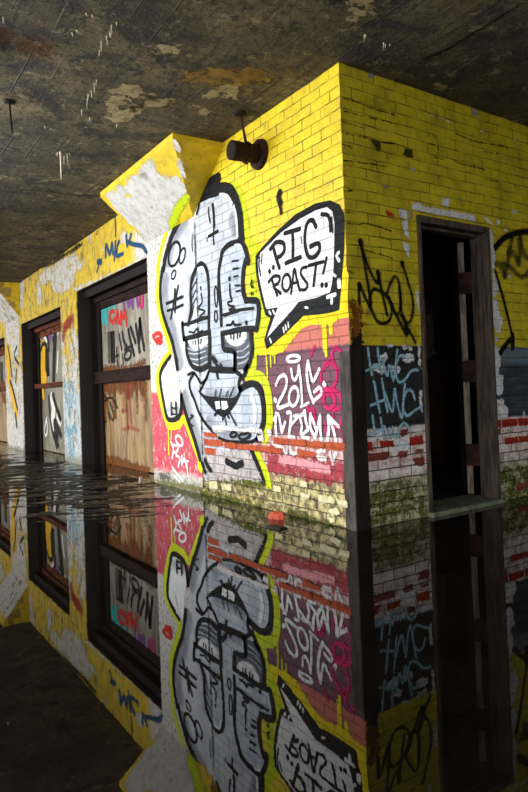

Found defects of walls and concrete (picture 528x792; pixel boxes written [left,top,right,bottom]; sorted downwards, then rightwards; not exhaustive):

peeling [157,44,183,55]
peeling [104,83,176,123]
peeling [180,66,271,116]
peeling [106,139,189,244]
peeling [37,252,146,305]
flaking render [372,291,437,374]
peeling [399,198,528,444]